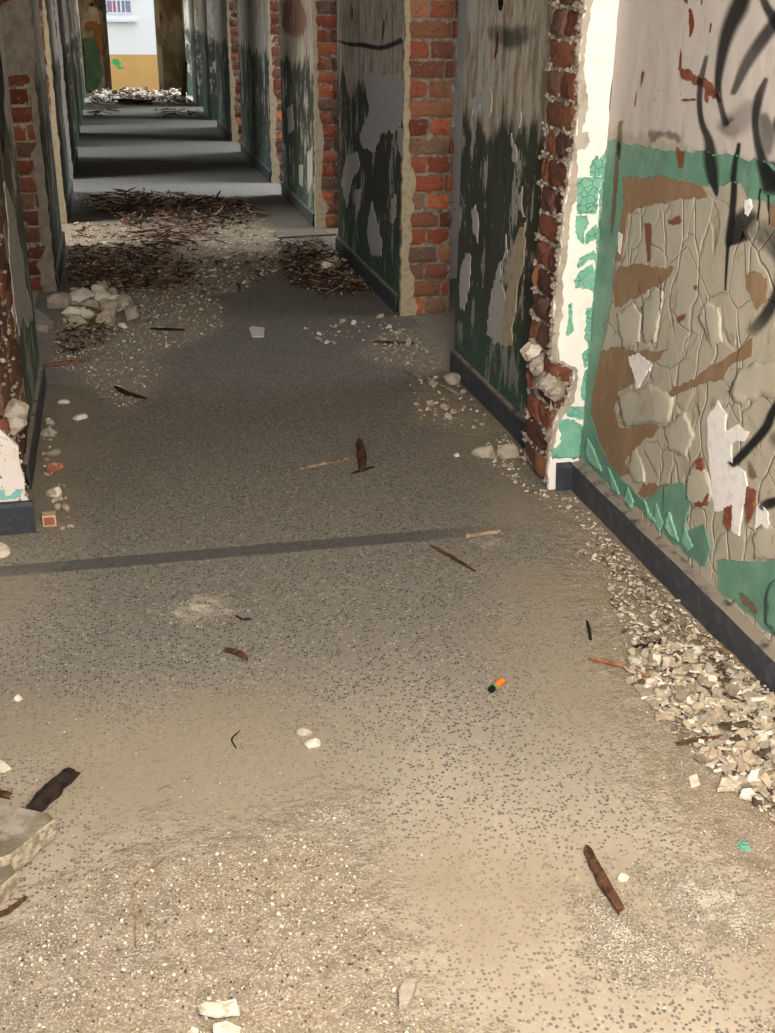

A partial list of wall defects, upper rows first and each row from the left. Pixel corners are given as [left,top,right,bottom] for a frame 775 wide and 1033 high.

peeling [471,205,479,243]
spalling [0,181,33,500]
peeling [459,253,472,310]
spalling [486,0,775,636]
crack [639,277,662,339]